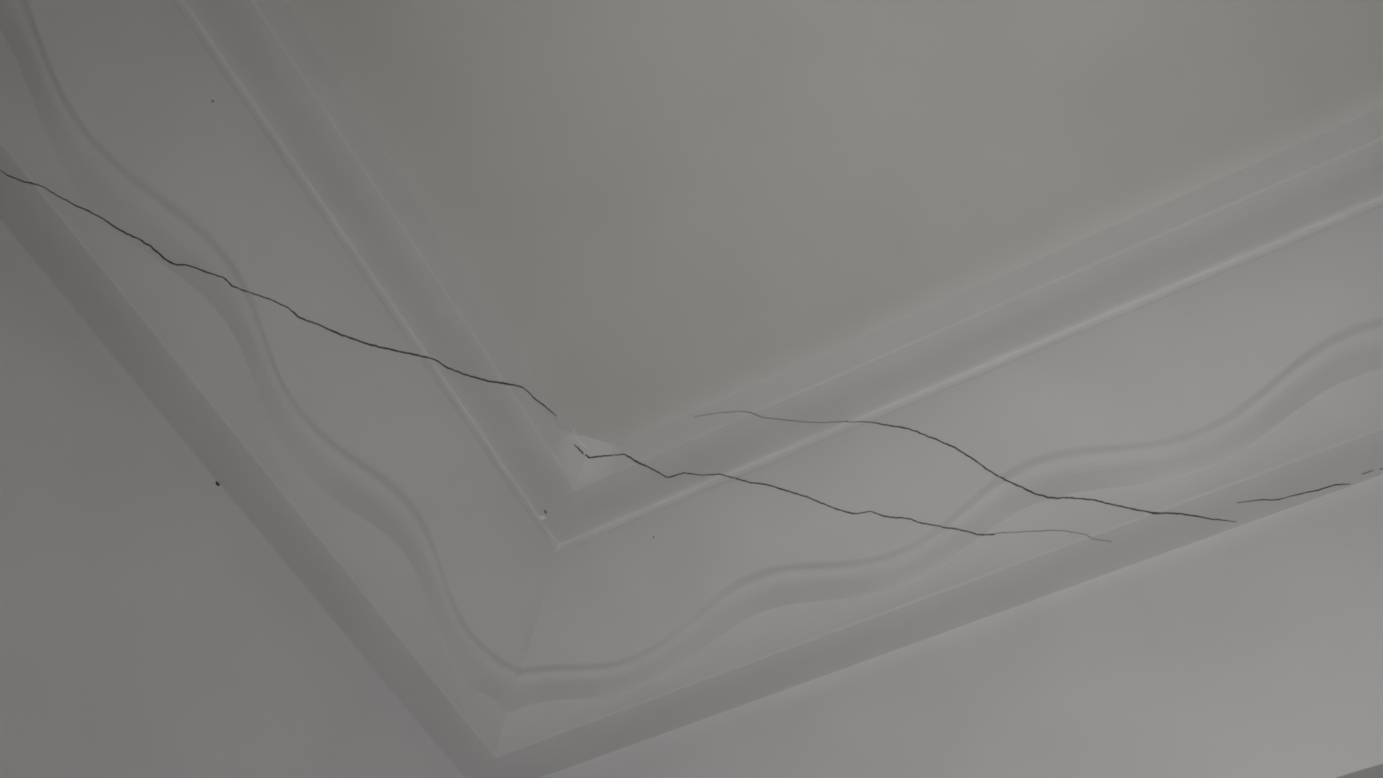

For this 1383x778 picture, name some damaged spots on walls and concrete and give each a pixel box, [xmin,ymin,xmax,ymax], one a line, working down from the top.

crack [0,170,1383,542]